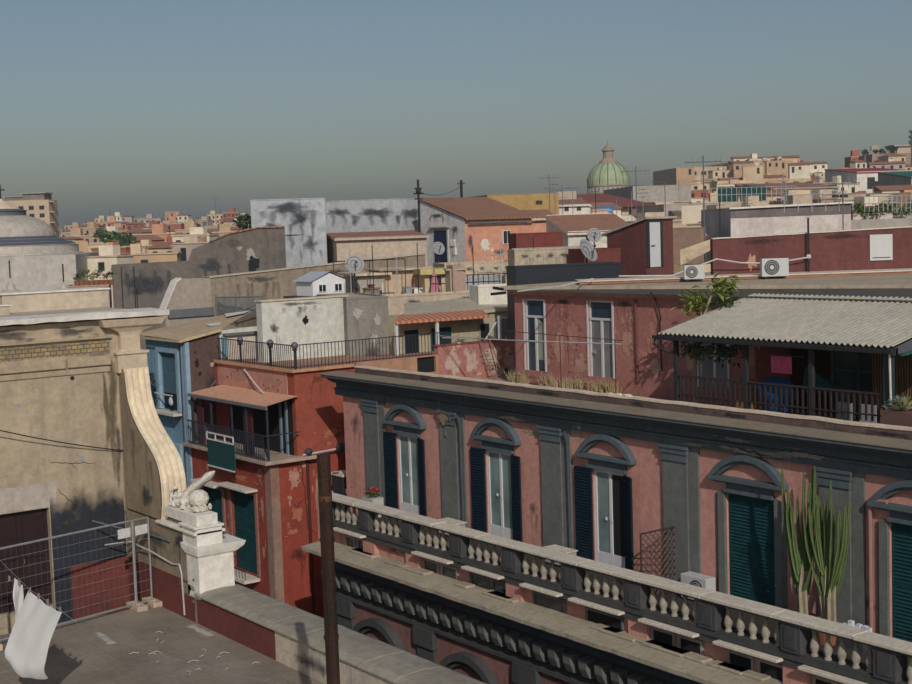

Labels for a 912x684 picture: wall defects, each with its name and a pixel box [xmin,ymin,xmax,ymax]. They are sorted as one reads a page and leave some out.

water stain [276,203,306,223]
peeling [354,335,515,379]
peeling [614,306,667,389]
peeling [284,461,318,537]